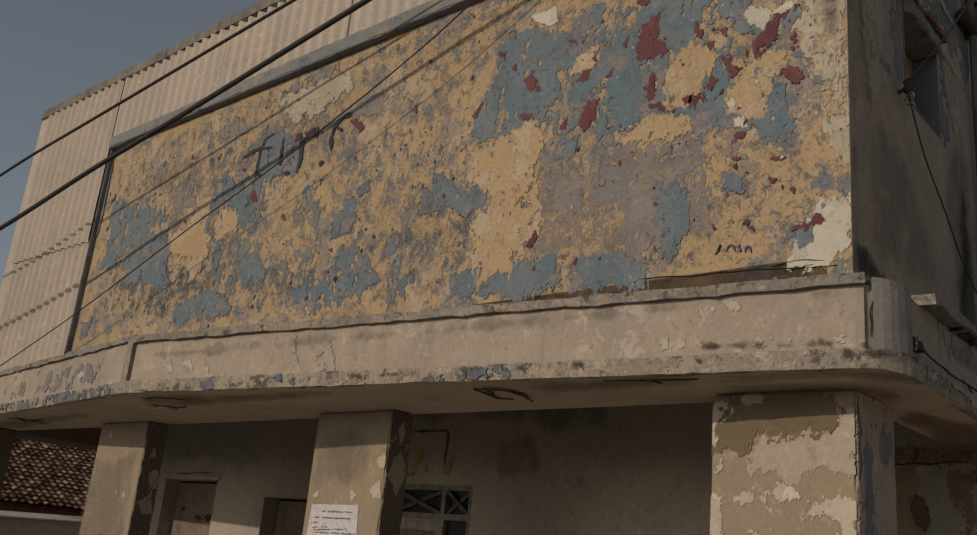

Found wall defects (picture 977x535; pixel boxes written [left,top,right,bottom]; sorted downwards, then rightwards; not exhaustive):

peeling [923,0,971,99]
peeling [96,63,418,328]
peeling [411,0,852,303]
water stain [958,192,977,326]
peeling [0,362,110,496]
peeling [370,410,413,535]
peeling [710,390,965,535]